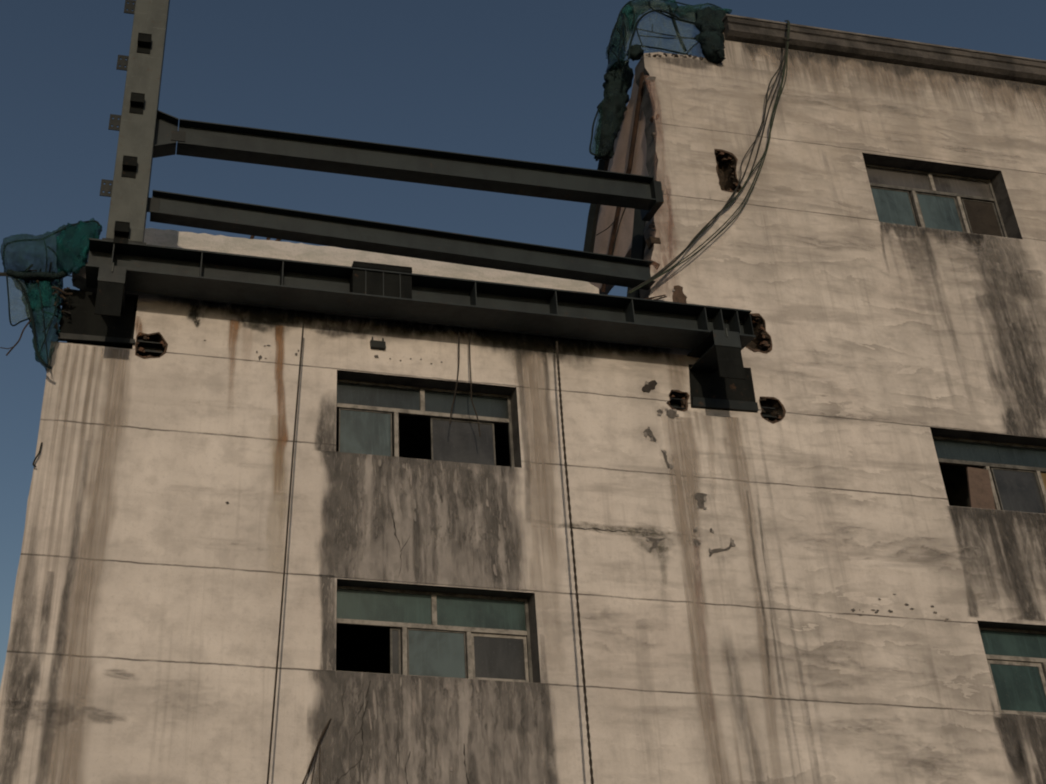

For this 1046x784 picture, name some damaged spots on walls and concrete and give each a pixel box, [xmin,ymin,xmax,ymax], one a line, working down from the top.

spalling [714,149,742,192]
spalling [135,332,168,359]
corrosion [230,320,239,342]
spalling [746,313,772,353]
leakage [881,222,1046,437]
corrosion [275,325,288,462]
leakage [174,297,677,533]
spalling [657,390,690,419]
spalling [759,396,786,423]
leakage [313,407,556,784]
leakage [950,506,1046,620]
leakage [996,713,1046,784]